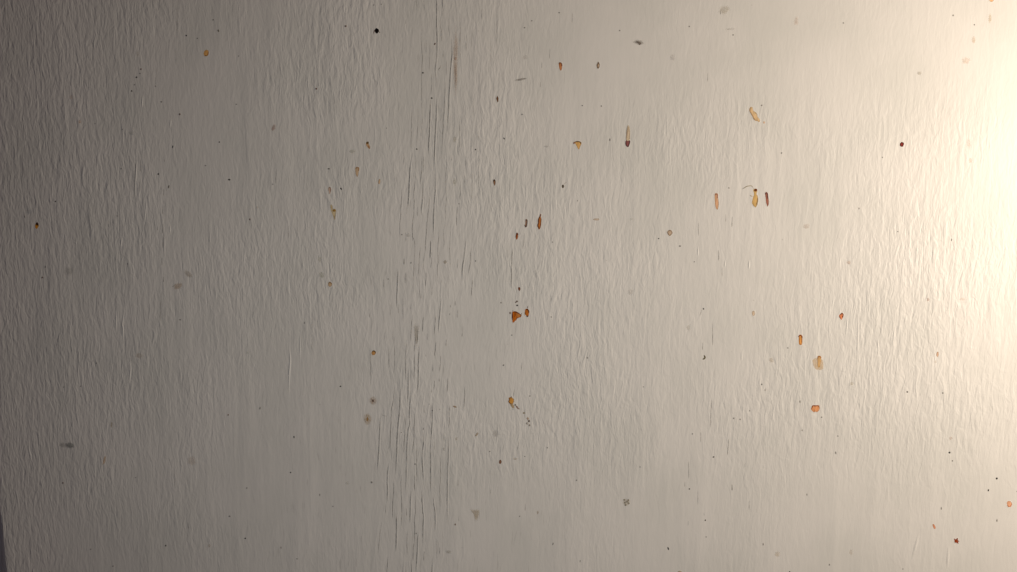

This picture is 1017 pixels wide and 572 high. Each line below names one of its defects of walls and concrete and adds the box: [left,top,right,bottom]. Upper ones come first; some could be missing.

crack [378,0,473,572]